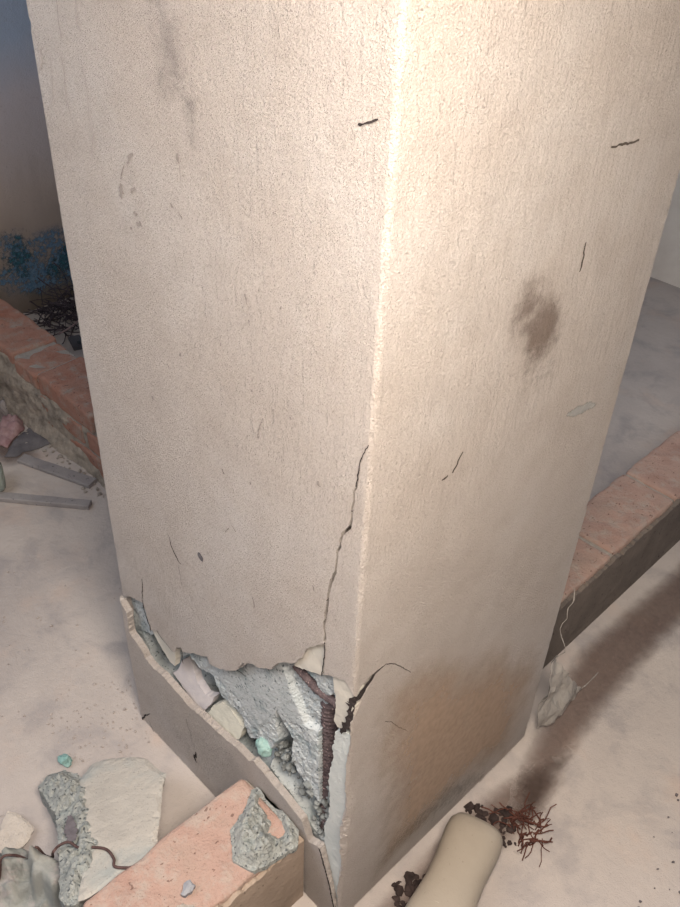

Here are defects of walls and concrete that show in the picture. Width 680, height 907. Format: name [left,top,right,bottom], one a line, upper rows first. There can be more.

crack [355,445,369,487]
spalling [131,597,364,907]